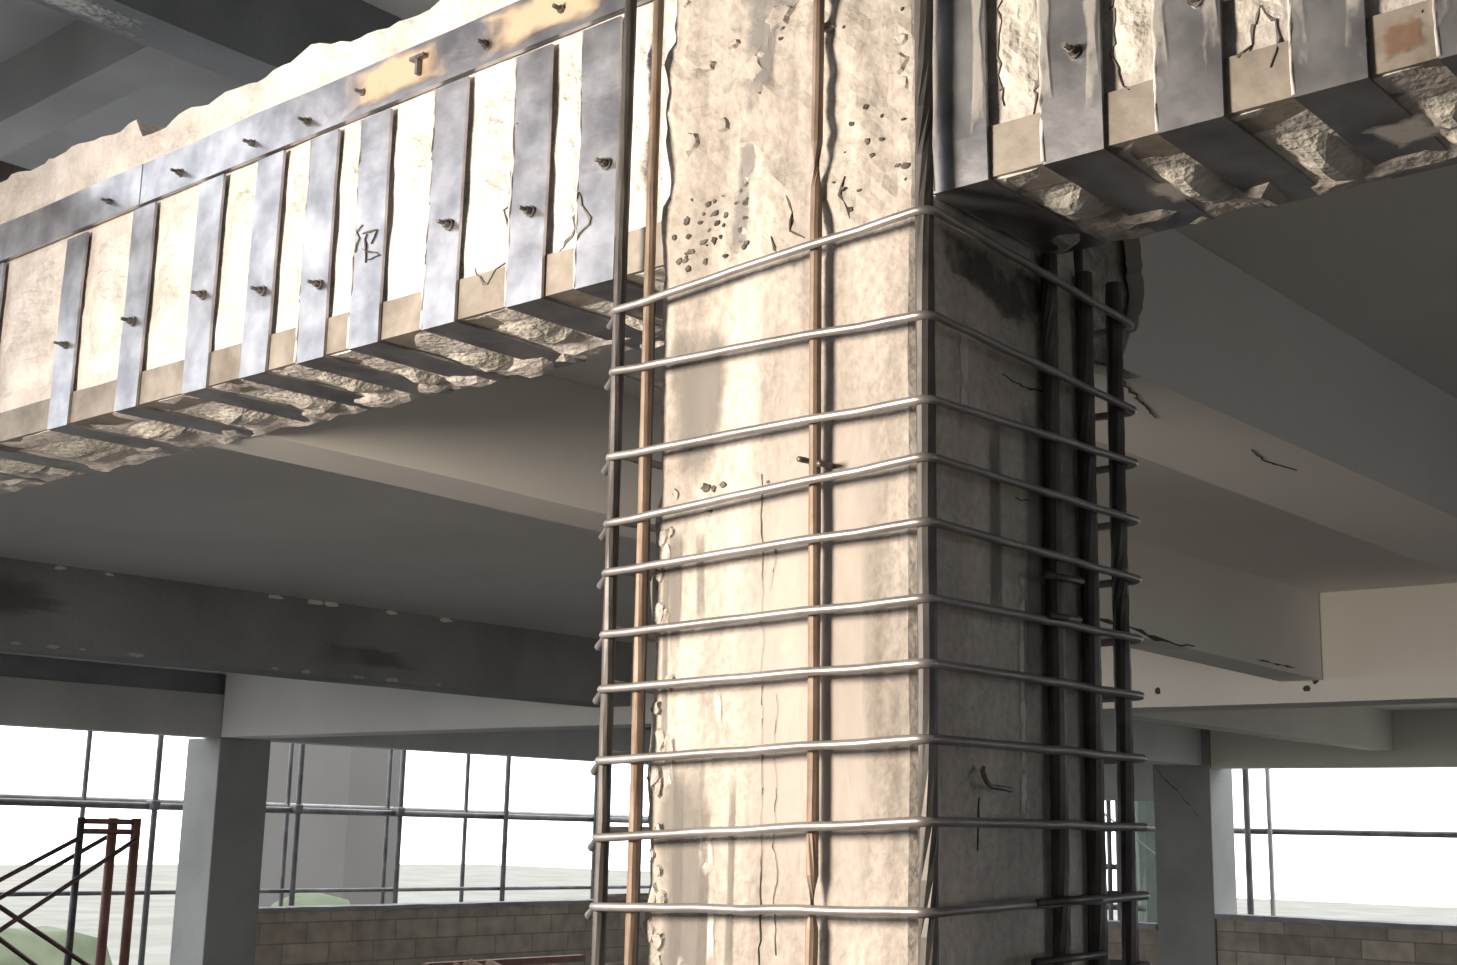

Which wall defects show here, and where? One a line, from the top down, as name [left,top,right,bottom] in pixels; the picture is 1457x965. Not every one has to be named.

water stain [44,0,136,24]
crack [1123,378,1157,419]
crack [1251,449,1297,471]
spalling [1040,249,1139,965]
crack [1100,618,1195,647]